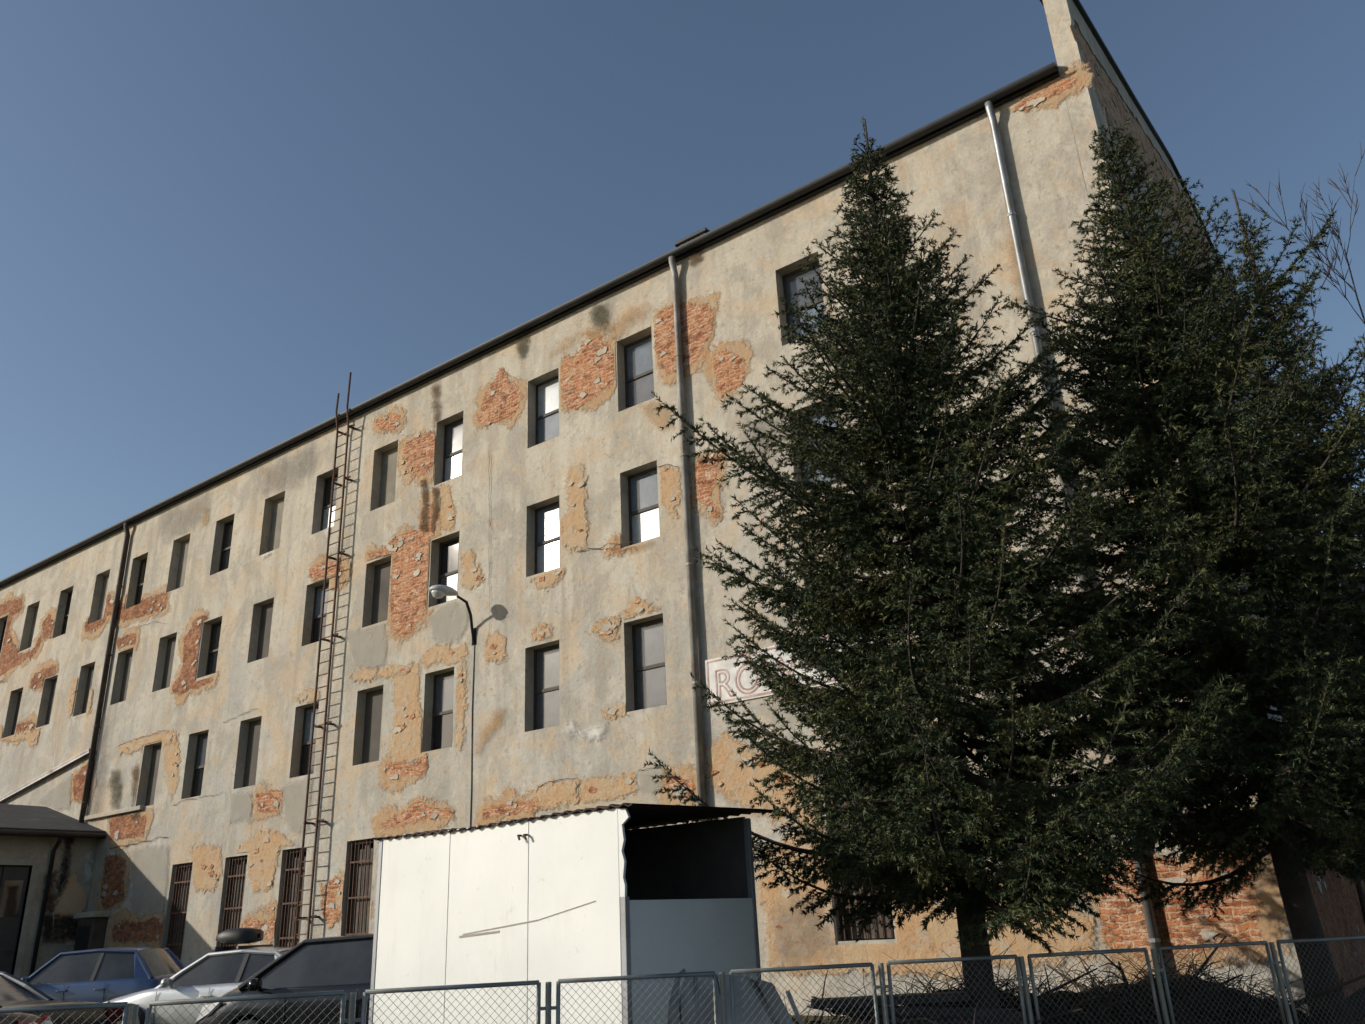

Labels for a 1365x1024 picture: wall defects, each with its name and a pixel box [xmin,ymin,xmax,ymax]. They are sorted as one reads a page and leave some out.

flaking render [1010,18,1210,284]
flaking render [472,368,527,431]
flaking render [559,331,621,413]
flaking render [653,292,754,404]
flaking render [308,404,456,646]
leakage [420,479,439,531]
flaking render [659,452,727,526]
flaking render [0,592,59,693]
flaking render [169,608,219,706]
flaking render [348,631,507,843]
flaking render [319,870,344,929]
flaking render [654,730,962,980]